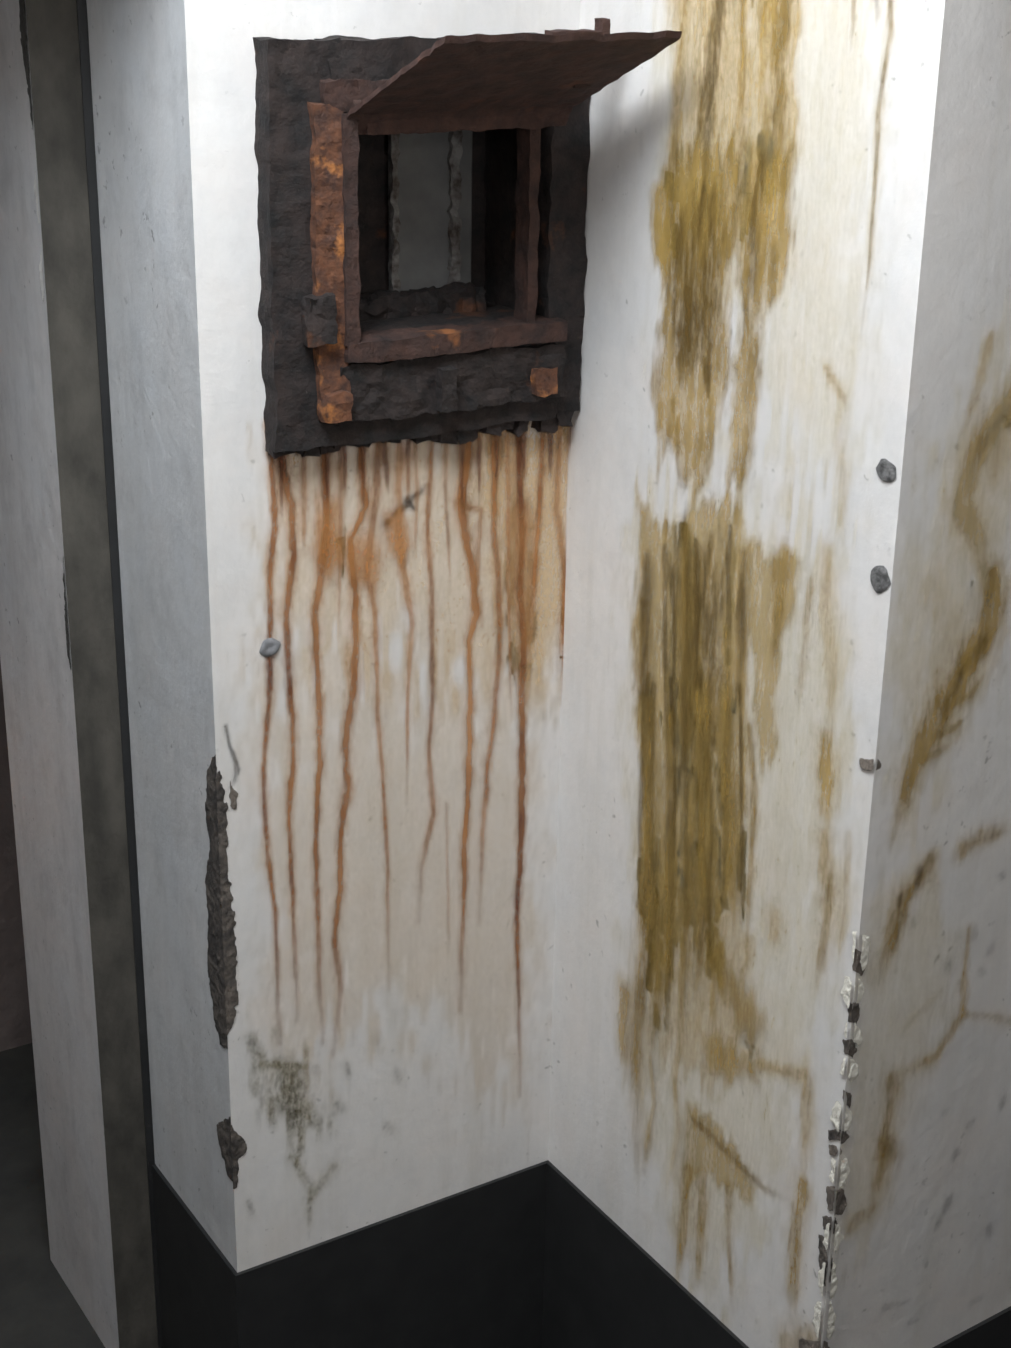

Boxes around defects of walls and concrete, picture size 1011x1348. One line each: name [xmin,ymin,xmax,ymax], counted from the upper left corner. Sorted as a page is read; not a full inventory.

rust [262,439,411,964]
rust [426,446,435,846]
rust [458,426,571,1007]
leakage [619,0,799,1082]
leakage [900,566,1005,804]
leakage [953,389,1011,551]
spalling [205,755,239,1049]
leakage [886,854,933,952]
spalling [216,1117,247,1189]
leakage [679,1109,757,1259]
leakage [789,1178,807,1293]